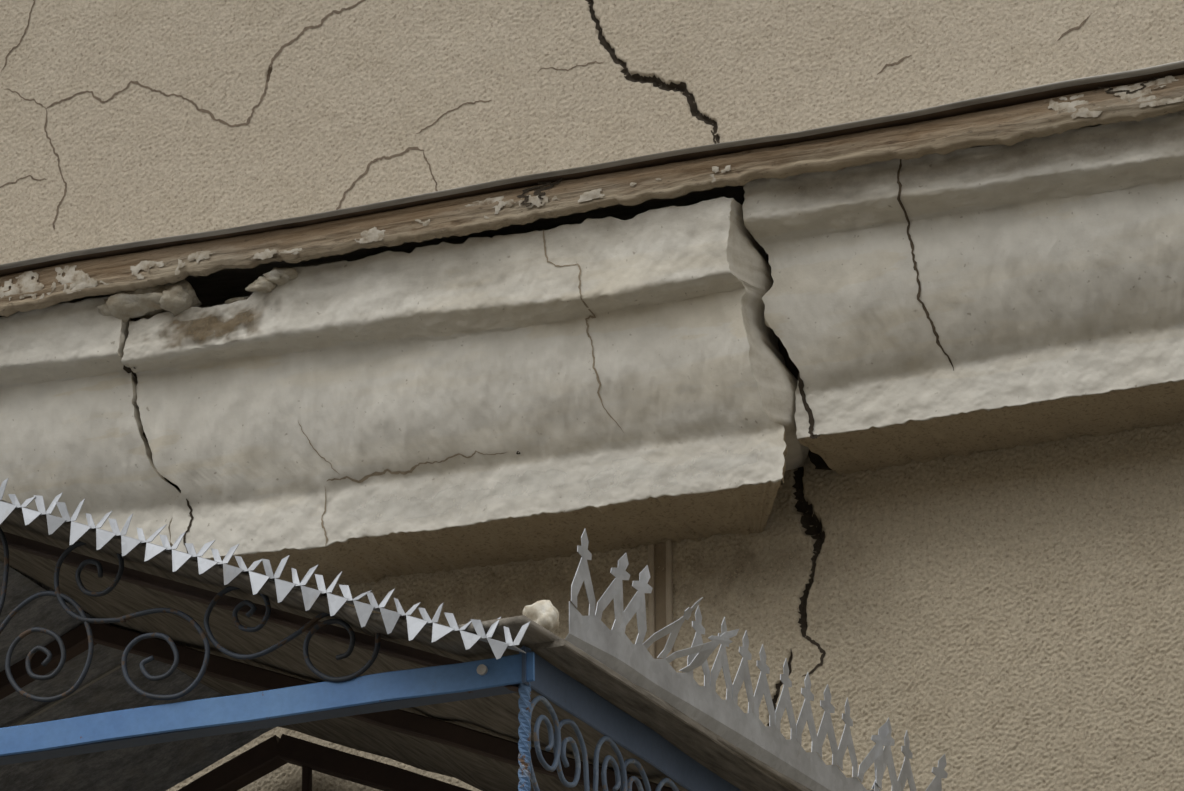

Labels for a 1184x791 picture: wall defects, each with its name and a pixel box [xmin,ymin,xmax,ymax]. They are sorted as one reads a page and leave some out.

crack [0,0,365,229]
crack [336,100,491,210]
crack [538,0,720,144]
spalling [0,251,215,322]
spalling [224,248,303,304]
peeling [355,227,385,244]
crack [517,178,624,433]
crack [897,159,954,371]
crack [123,365,137,379]
crack [164,477,194,553]
crack [298,422,506,545]
crack [767,337,832,726]